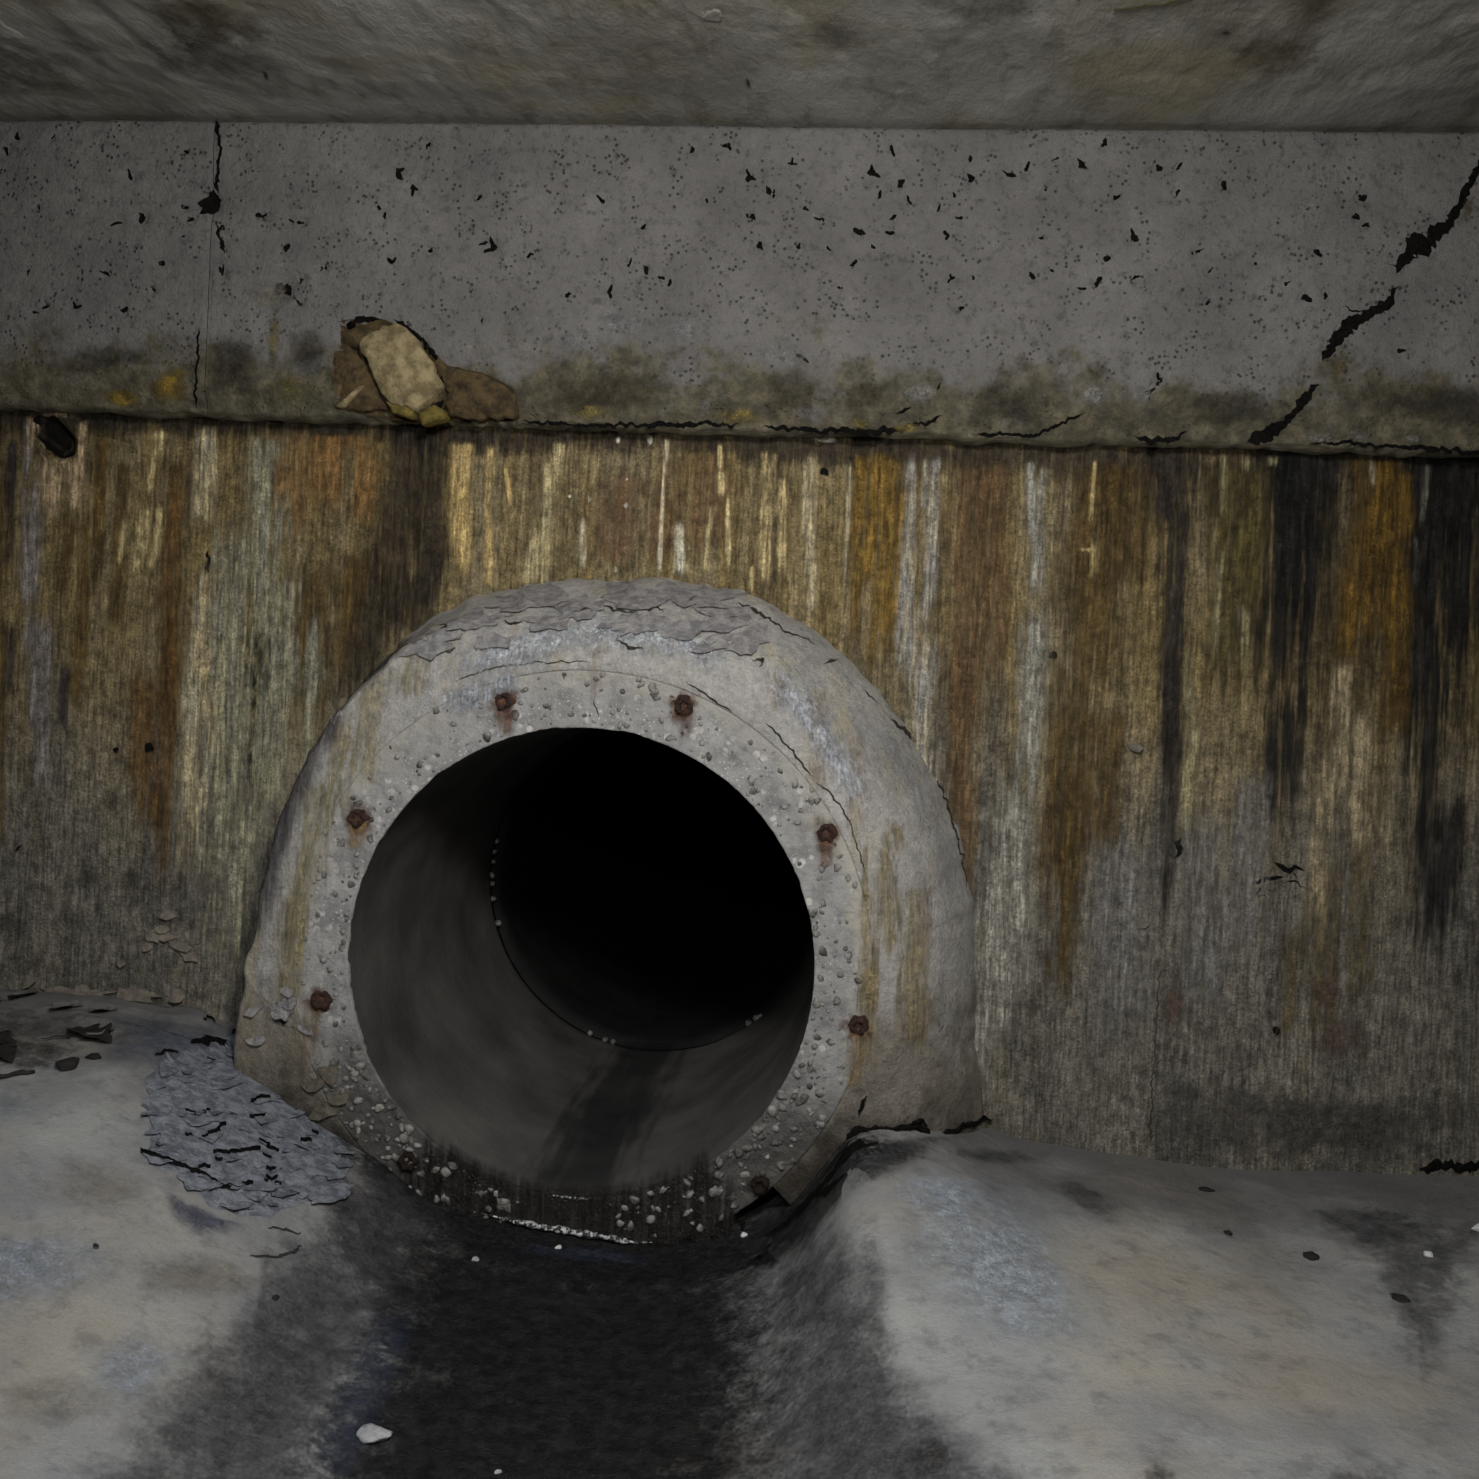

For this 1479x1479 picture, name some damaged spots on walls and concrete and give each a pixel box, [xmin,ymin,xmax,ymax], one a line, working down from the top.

spalling [331,315,521,428]
crack [523,405,942,437]
crack [1247,160,1479,456]
spalling [433,671,718,762]
water stain [0,411,1479,1065]
crack [767,724,868,882]
spalling [140,745,465,1217]
spalling [615,843,868,1238]
rust [860,829,927,1054]
water stain [130,1132,974,1479]
crack [764,1095,992,1236]
water stain [1321,1210,1476,1340]